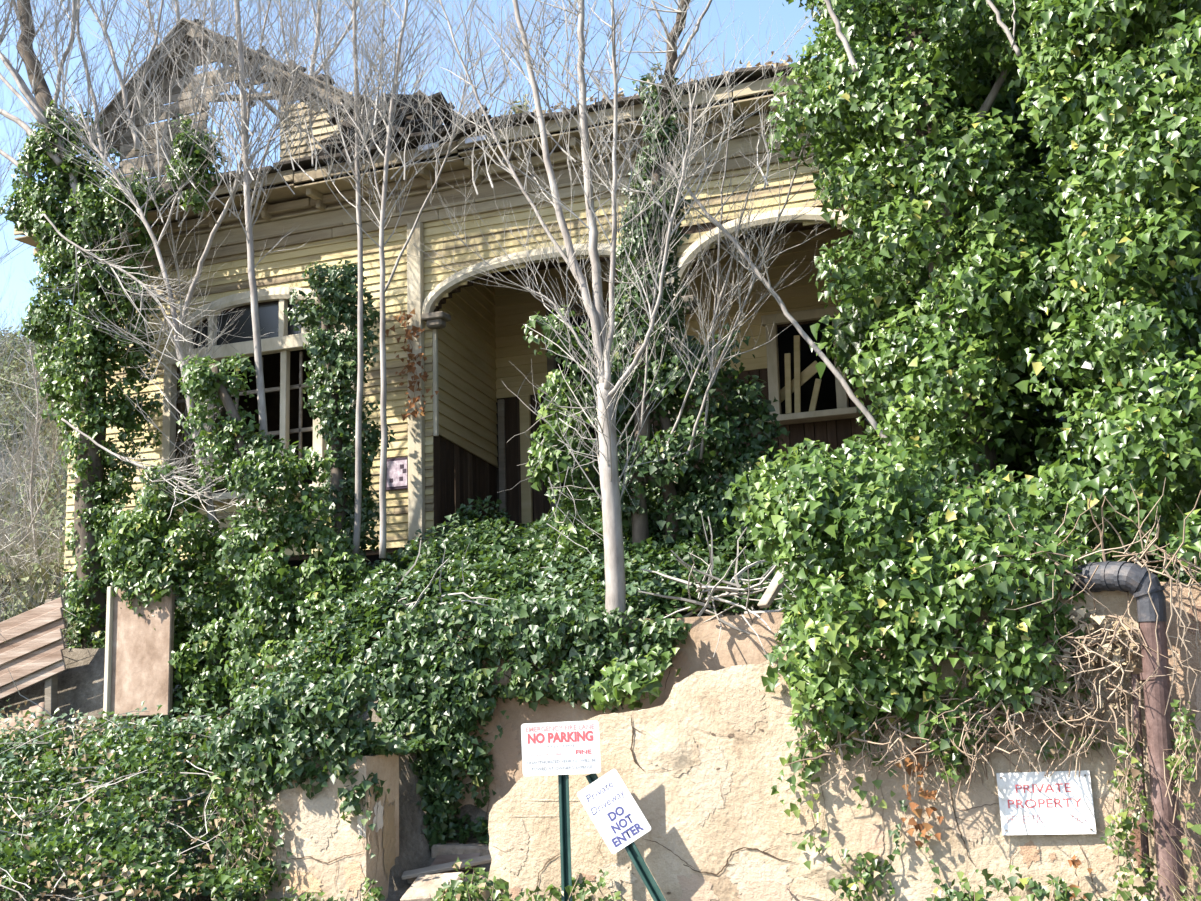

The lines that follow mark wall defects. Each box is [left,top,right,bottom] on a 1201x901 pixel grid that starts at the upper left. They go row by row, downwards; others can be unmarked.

crack [630,718,681,771]
crack [279,797,379,887]
crack [645,839,838,901]